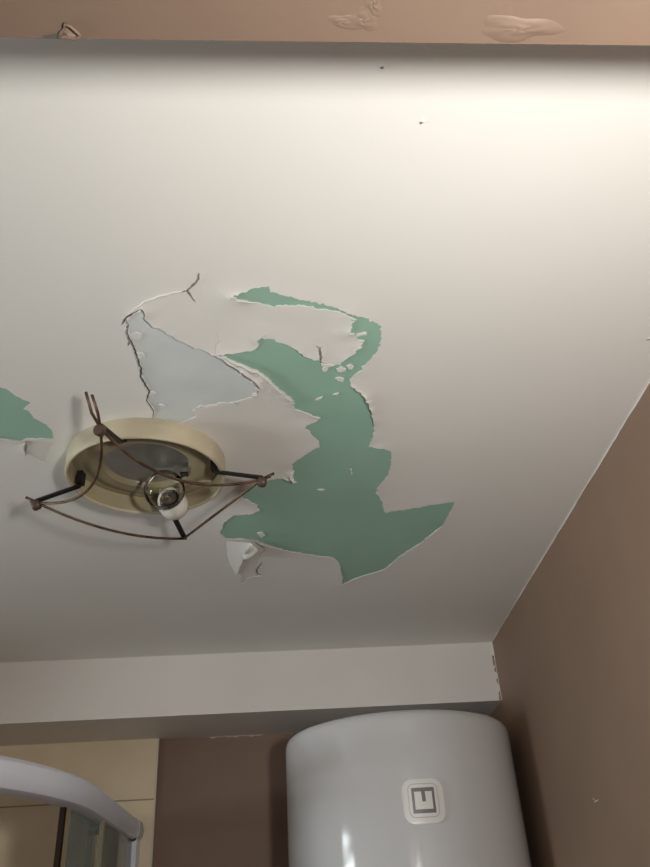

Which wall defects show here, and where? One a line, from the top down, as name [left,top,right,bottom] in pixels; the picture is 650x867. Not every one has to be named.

flaking render [43,22,81,41]
peeling [0,378,63,470]
peeling [116,275,467,596]